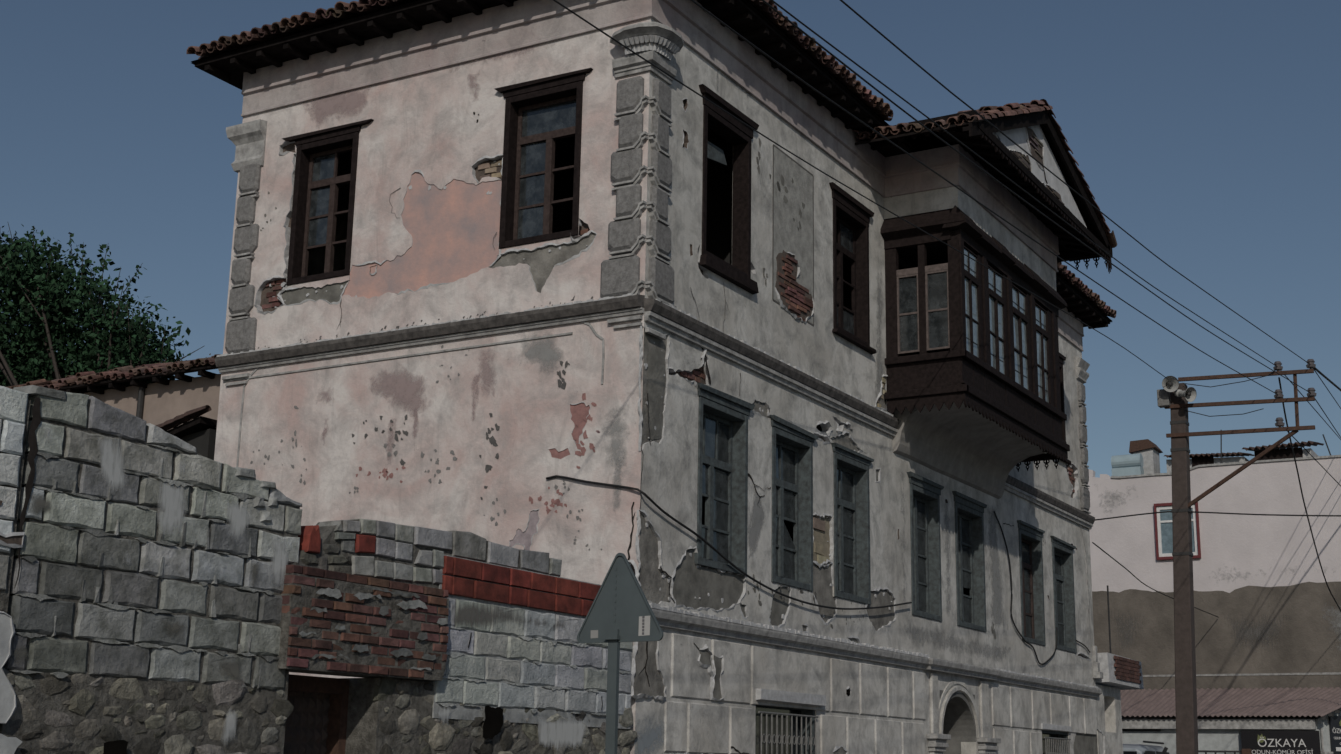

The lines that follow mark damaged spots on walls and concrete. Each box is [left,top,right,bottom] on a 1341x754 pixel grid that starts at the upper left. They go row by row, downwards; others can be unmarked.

spalling [254,141,597,314]
spalling [751,250,814,323]
peeling [557,361,570,389]
spalling [638,326,710,451]
peeling [548,393,600,469]
peeling [479,413,506,526]
peeling [509,480,602,551]
spalling [627,510,896,643]
spalling [631,641,667,700]
spalling [698,644,724,701]